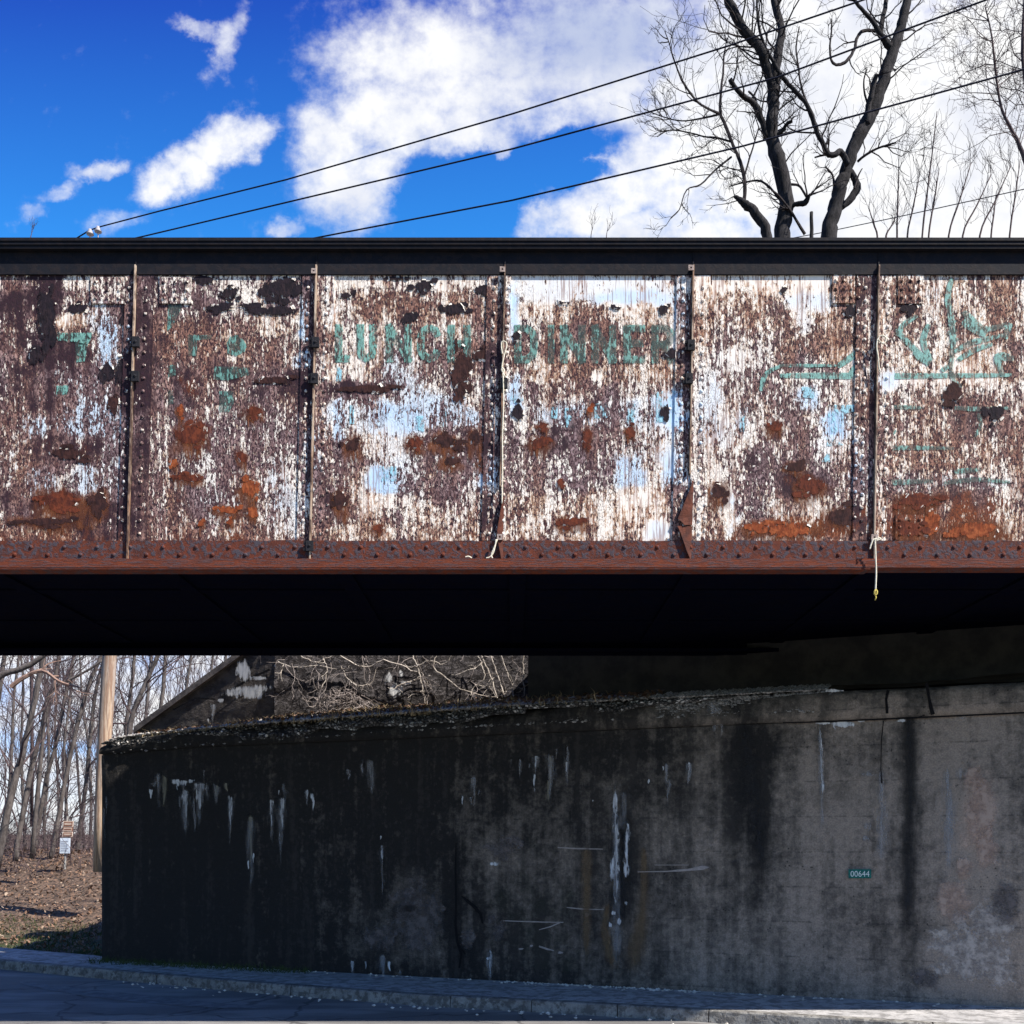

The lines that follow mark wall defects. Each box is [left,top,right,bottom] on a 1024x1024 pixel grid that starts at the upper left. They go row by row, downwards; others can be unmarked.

peeling [27,283,89,365]
peeling [192,275,302,316]
peeling [437,302,473,314]
peeling [450,339,486,403]
peeling [510,398,526,420]
corrosion [404,429,484,473]
corrosion [7,488,108,537]
corrosion [196,451,261,536]
corrosion [741,459,853,541]
leakage [207,659,267,722]
leakage [149,776,232,825]
leakage [609,793,631,927]